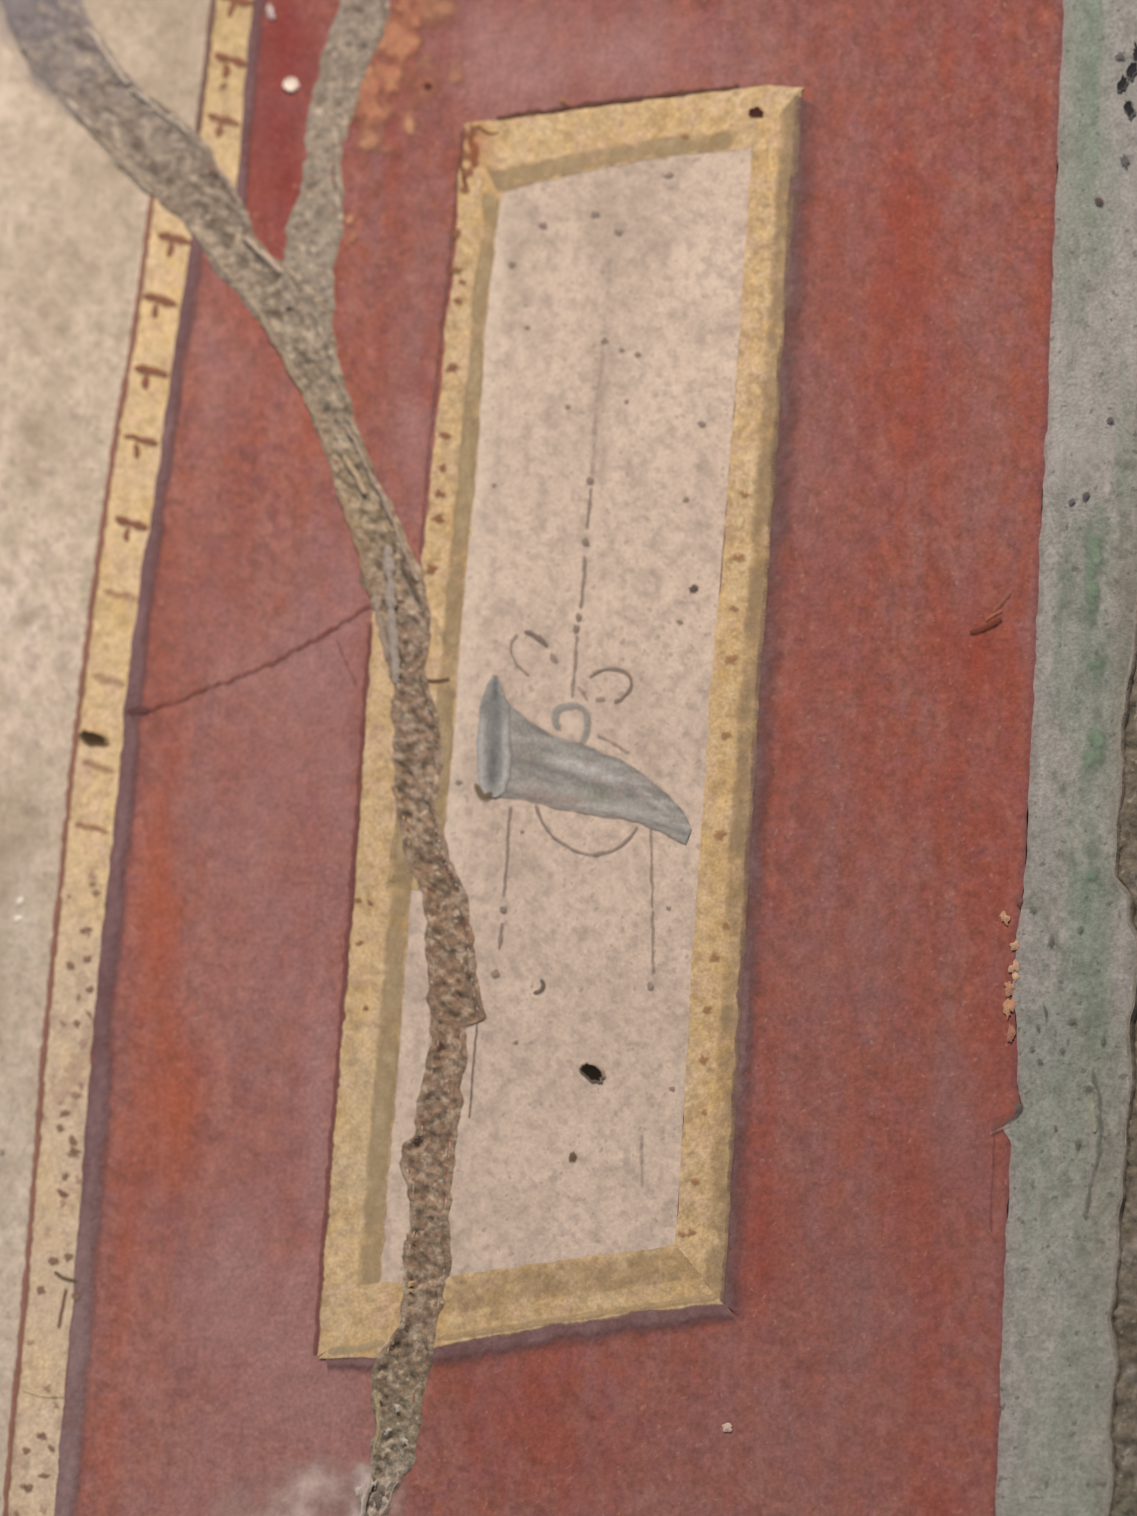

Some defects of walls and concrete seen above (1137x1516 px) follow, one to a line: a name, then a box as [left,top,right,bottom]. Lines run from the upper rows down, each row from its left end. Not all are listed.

crack [0,0,487,1516]